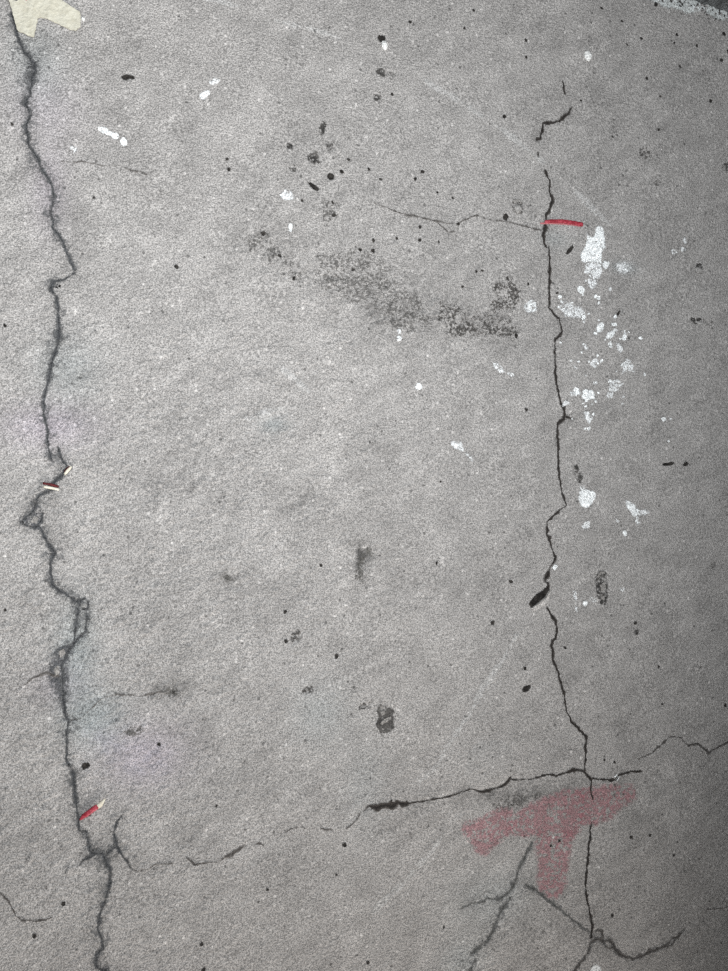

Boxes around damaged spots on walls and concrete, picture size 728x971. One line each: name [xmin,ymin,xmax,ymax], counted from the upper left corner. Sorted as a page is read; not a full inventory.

crack [11,13,264,971]
crack [285,81,728,971]